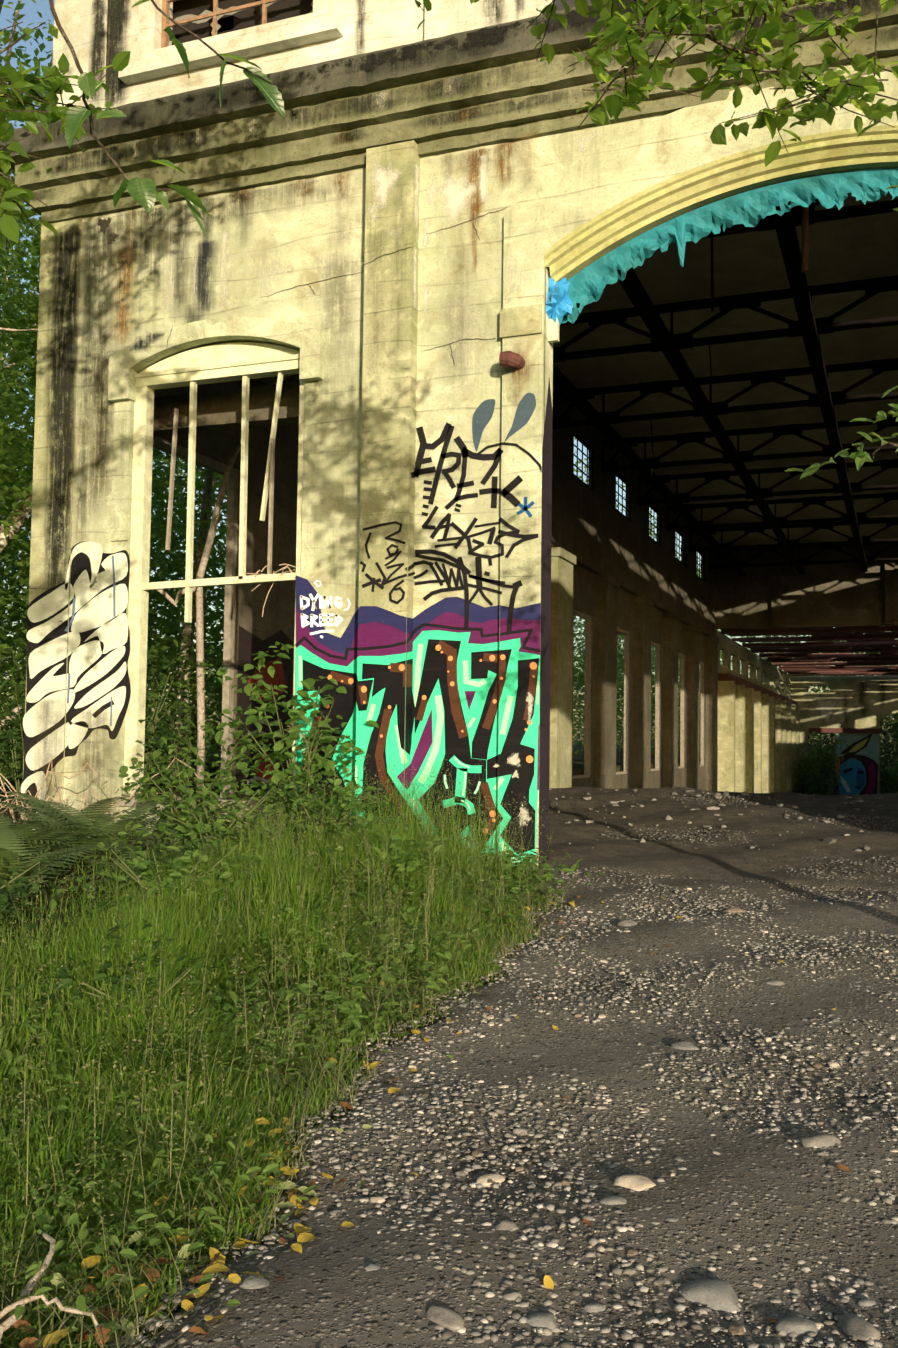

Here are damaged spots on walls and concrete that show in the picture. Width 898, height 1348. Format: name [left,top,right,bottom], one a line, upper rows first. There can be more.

damp [467,0,523,54]
damp [91,0,138,126]
damp [187,81,265,113]
damp [289,92,396,124]
damp [422,77,468,99]
damp [52,137,168,172]
corrosion [498,143,512,180]
corrosion [468,150,483,227]
damp [166,202,228,322]
damp [131,334,162,350]
damp [47,226,112,588]